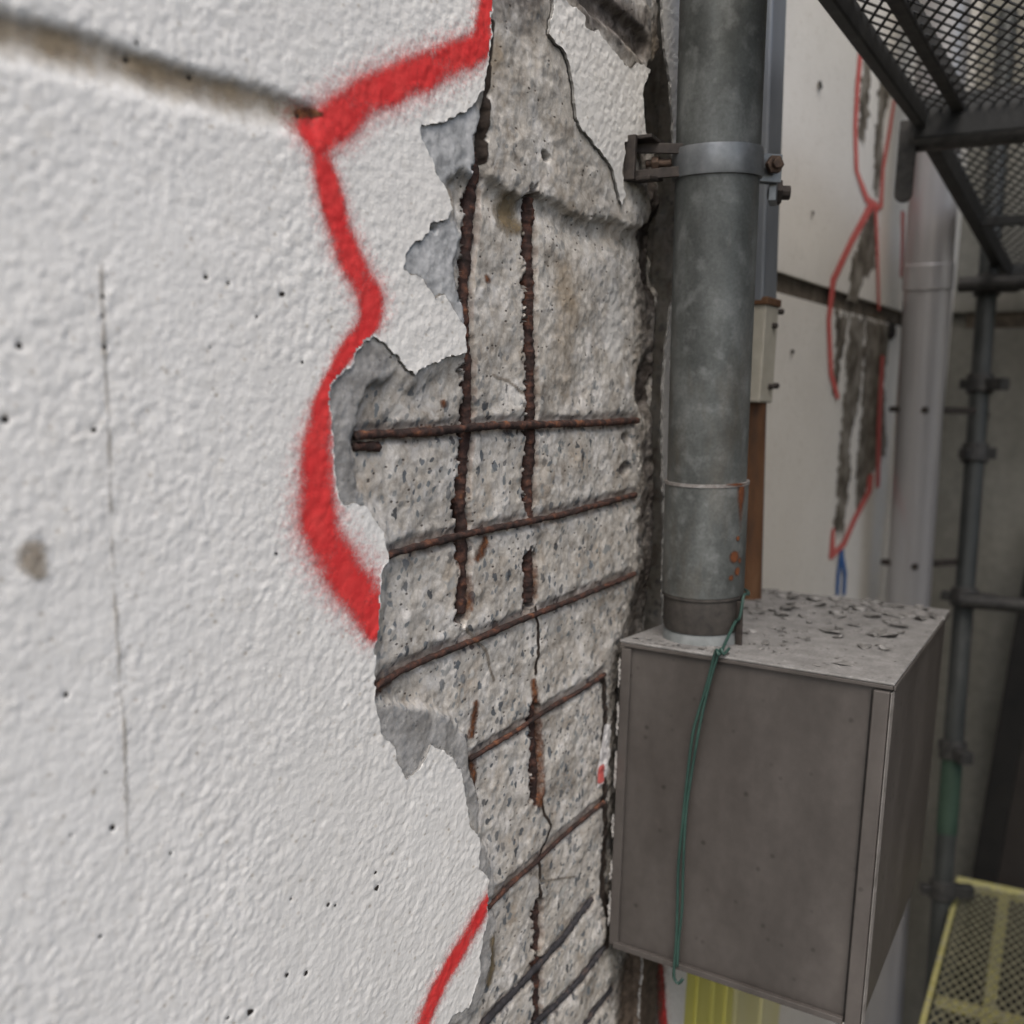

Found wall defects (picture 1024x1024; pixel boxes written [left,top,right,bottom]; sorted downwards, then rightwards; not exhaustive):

corrosion [496,194,522,233]
spalling [329,0,660,1024]
corrosion [475,536,489,562]
crack [533,606,541,675]
corrosion [468,700,479,738]
corrosion [529,679,545,807]
corrosion [468,754,477,784]
corrosion [487,936,495,986]